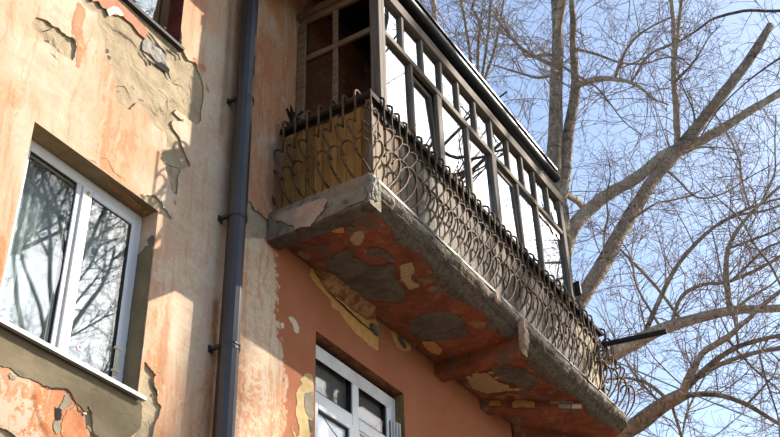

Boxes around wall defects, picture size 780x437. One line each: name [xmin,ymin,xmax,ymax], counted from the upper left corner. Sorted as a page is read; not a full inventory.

flaking render [32,0,209,195]
flaking render [140,194,172,219]
peeling [245,173,380,239]
flaking render [326,227,420,302]
peeling [281,317,299,333]
peeling [310,268,379,351]
flaking render [390,311,469,355]
spalling [518,317,530,350]
peeling [61,404,96,437]
flaking render [134,362,162,437]
peeling [292,373,314,437]
flaking render [465,365,539,408]